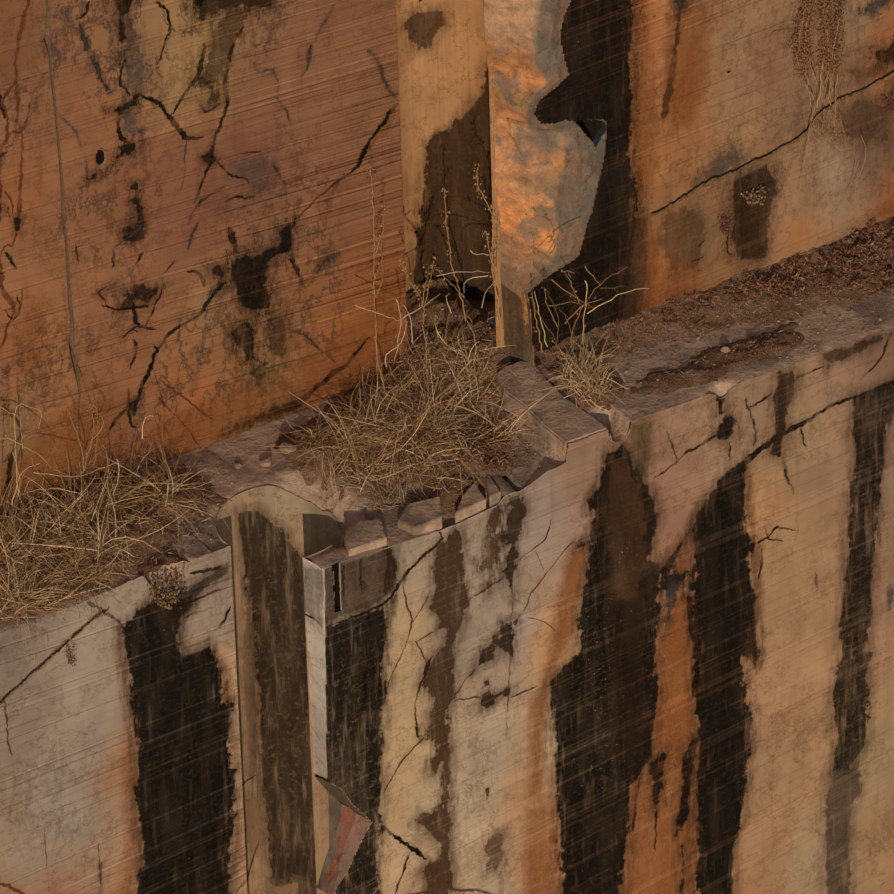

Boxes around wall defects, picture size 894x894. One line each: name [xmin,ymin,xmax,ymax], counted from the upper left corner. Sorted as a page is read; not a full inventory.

crack [43,0,82,487]
crack [108,325,208,444]
spalling [484,0,606,325]
leakage [528,0,648,366]
crack [652,70,894,216]
crack [0,607,123,755]
leakage [120,566,238,894]
leakage [238,511,317,894]
leakage [325,549,397,894]
crack [392,834,428,894]
leakage [415,493,537,894]
leakage [550,397,760,894]